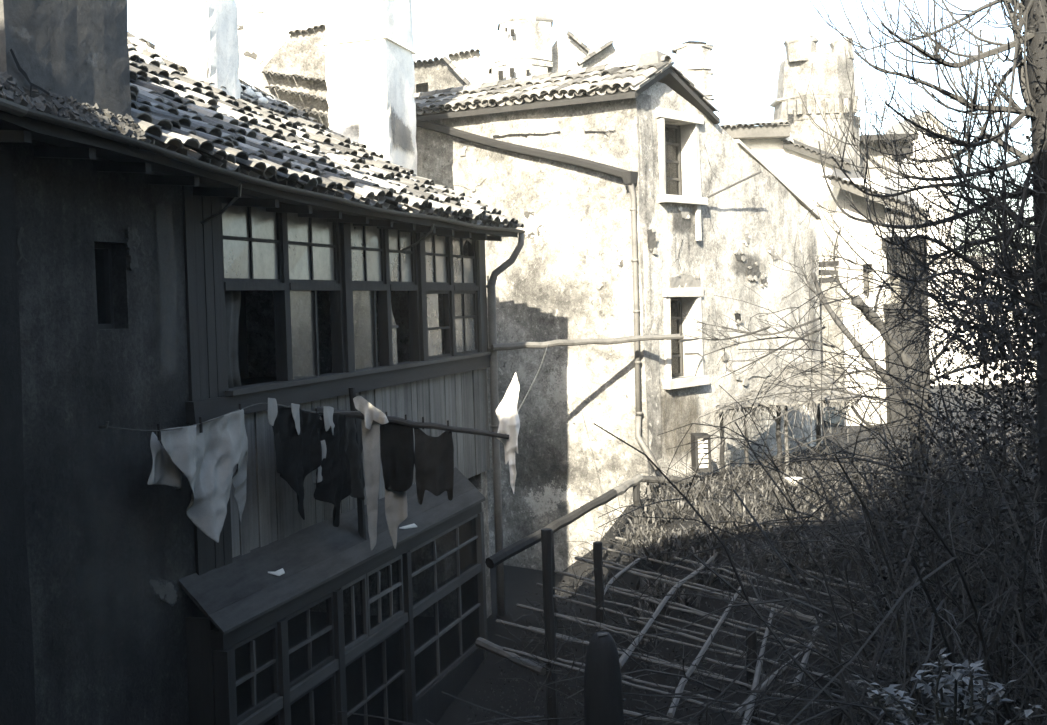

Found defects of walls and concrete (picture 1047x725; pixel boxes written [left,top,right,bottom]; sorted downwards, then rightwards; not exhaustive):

spalling [734,233,768,288]